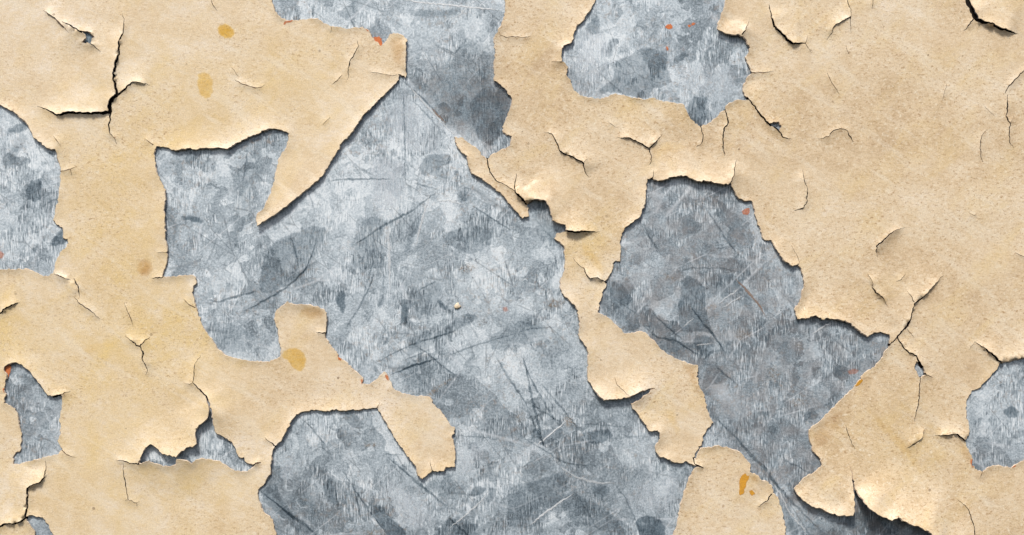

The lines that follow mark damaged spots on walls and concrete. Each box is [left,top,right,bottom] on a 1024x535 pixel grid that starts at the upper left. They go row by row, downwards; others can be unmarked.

crack [38,10,148,144]
crack [769,0,873,54]
crack [965,0,1016,34]
peeling [0,106,68,276]
crack [544,132,588,176]
crack [610,123,662,180]
peeling [155,0,940,535]
peeling [4,363,62,464]
peeling [134,403,253,471]
corrosion [739,474,755,495]
crack [870,275,966,447]
peeling [965,339,1024,471]